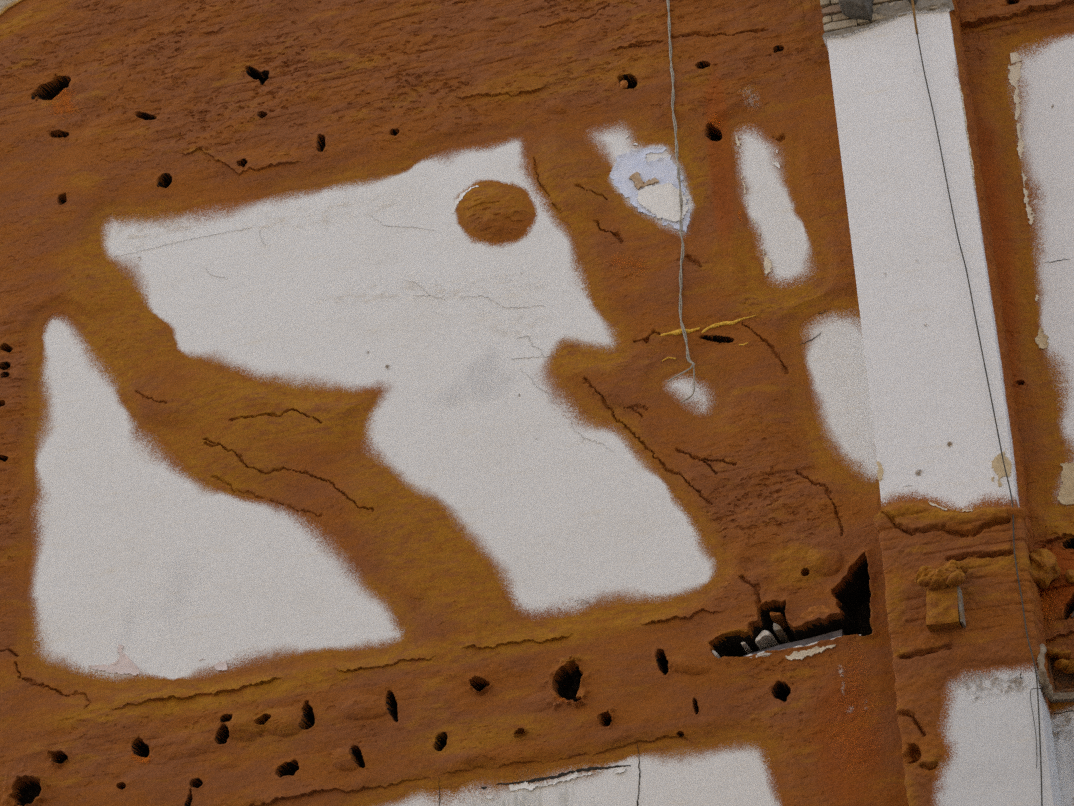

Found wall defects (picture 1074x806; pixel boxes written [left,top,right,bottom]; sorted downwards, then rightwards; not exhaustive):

peeling [1008,52,1036,225]
peeling [610,135,691,233]
crack [202,407,375,518]
peeling [1057,463,1074,505]
crack [0,647,92,710]
crack [481,744,641,806]
peeling [509,767,626,791]